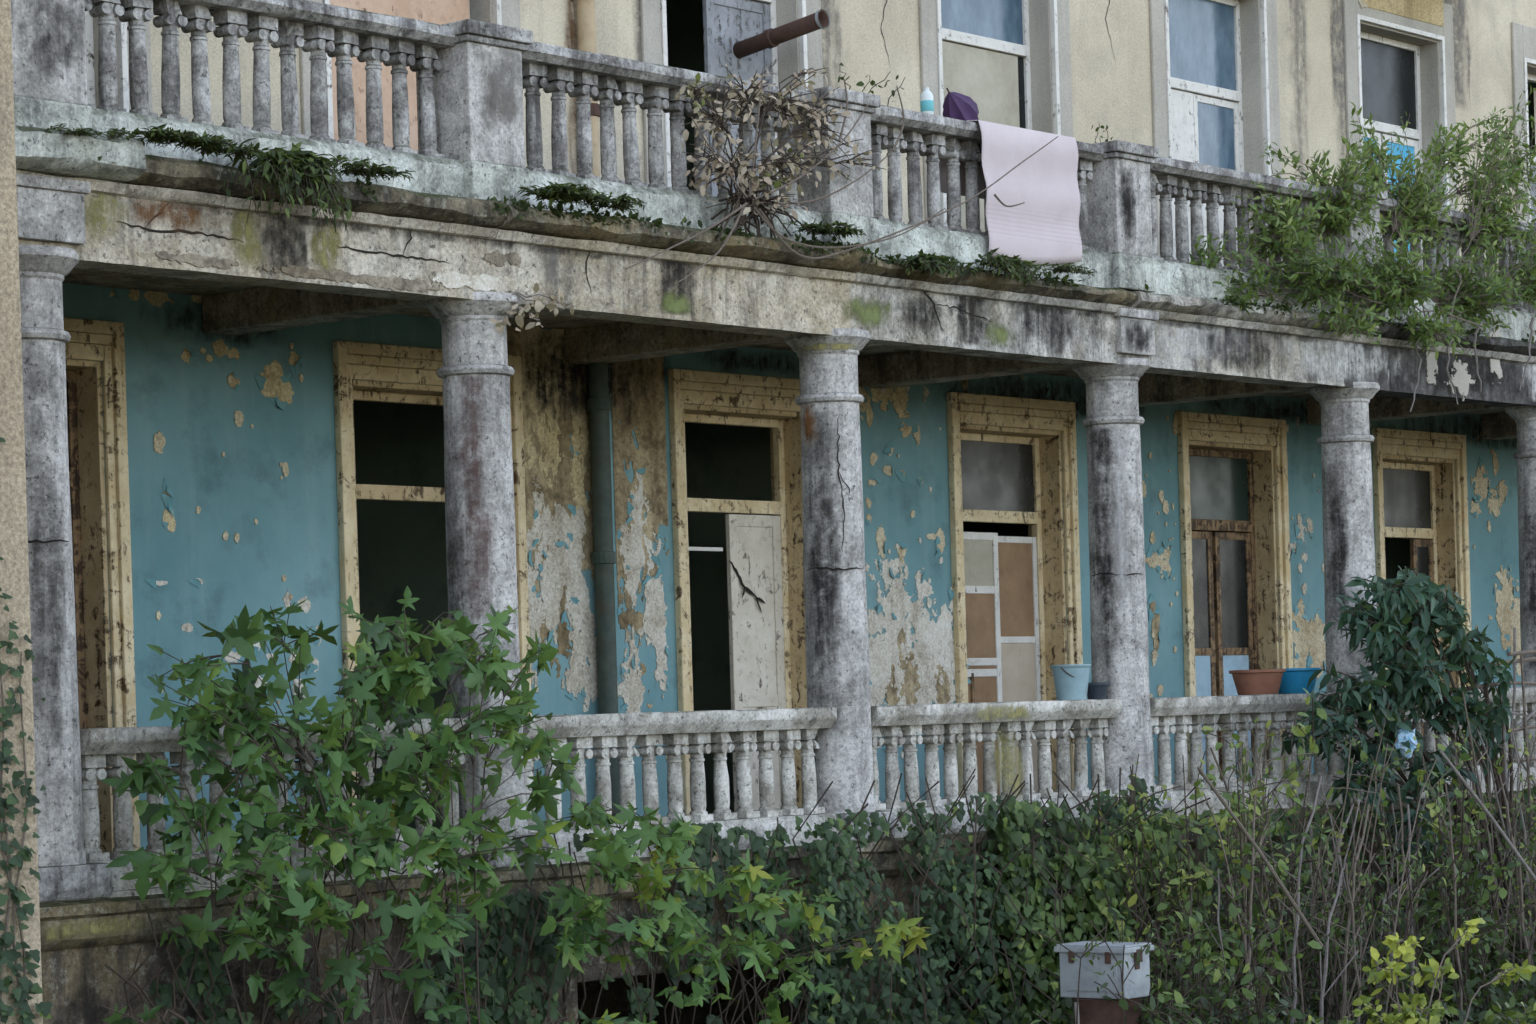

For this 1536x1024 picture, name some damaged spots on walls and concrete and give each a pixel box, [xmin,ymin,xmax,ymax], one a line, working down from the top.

peeling [181,339,305,428]
water stain [407,230,624,295]
water stain [644,258,695,301]
water stain [909,292,982,343]
water stain [1010,301,1093,346]
spalling [1425,318,1503,401]
peeling [506,325,598,715]
peeling [610,357,670,713]
water stain [810,474,834,671]
peeling [858,386,971,706]
water stain [1092,429,1124,687]
peeling [1475,564,1521,676]